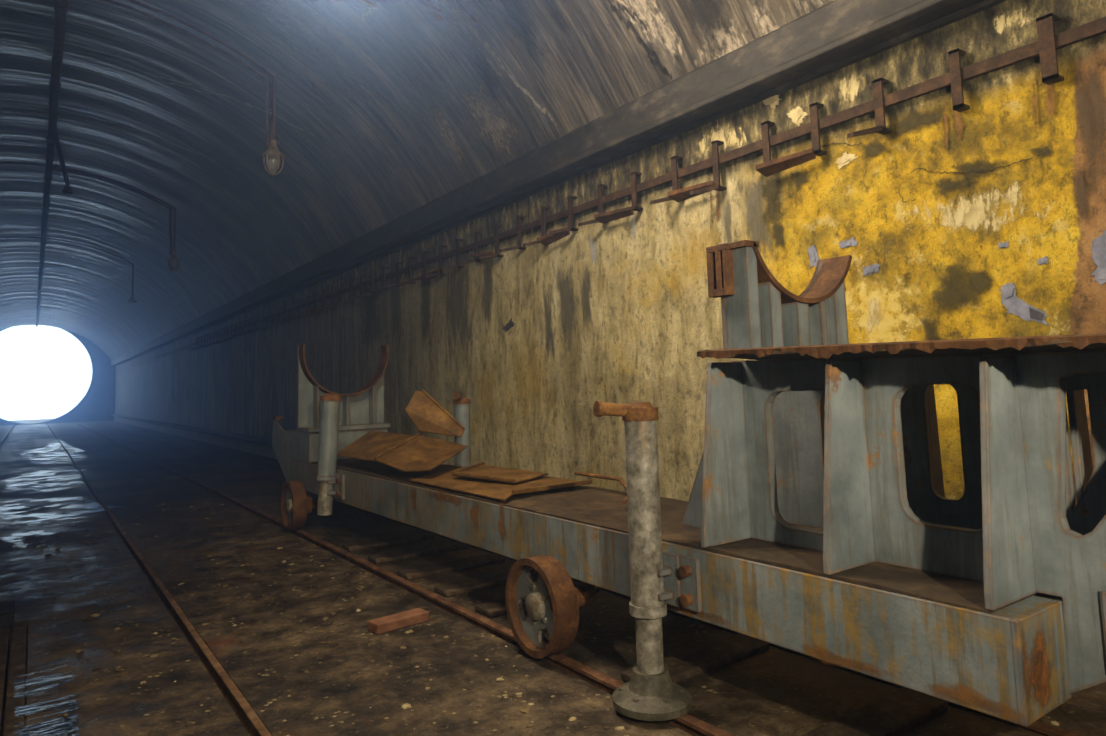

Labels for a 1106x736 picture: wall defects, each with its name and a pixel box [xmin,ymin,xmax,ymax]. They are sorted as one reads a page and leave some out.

leakage [617,0,682,56]
leakage [698,19,748,60]
leakage [754,9,779,36]
leakage [865,106,953,158]
leakage [935,161,998,196]
leakage [1031,146,1052,157]
leakage [738,172,808,252]
peeling [1090,230,1106,285]
leakage [482,261,492,322]
leakage [543,241,597,357]
leakage [921,264,993,341]
peeling [999,282,1049,325]